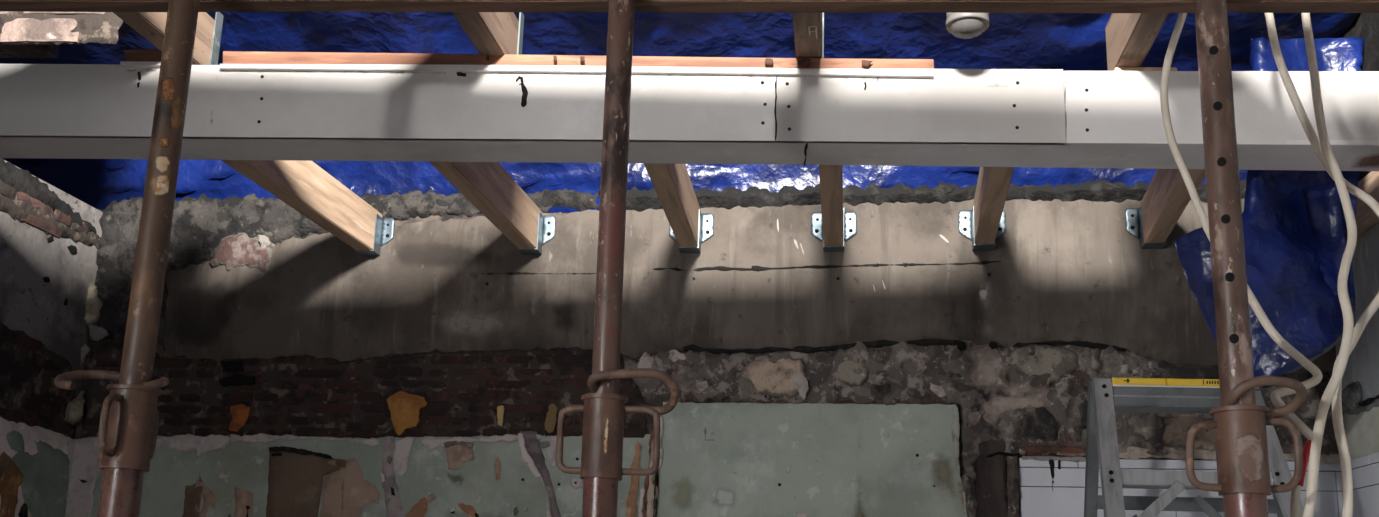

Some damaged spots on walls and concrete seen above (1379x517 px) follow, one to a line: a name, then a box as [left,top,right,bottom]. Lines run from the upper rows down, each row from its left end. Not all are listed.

spalling [527,188,608,213]
crack [481,269,596,277]
crack [653,261,1001,271]
flaking render [0,138,593,517]
spalling [604,340,1219,517]
spalling [1263,369,1344,464]